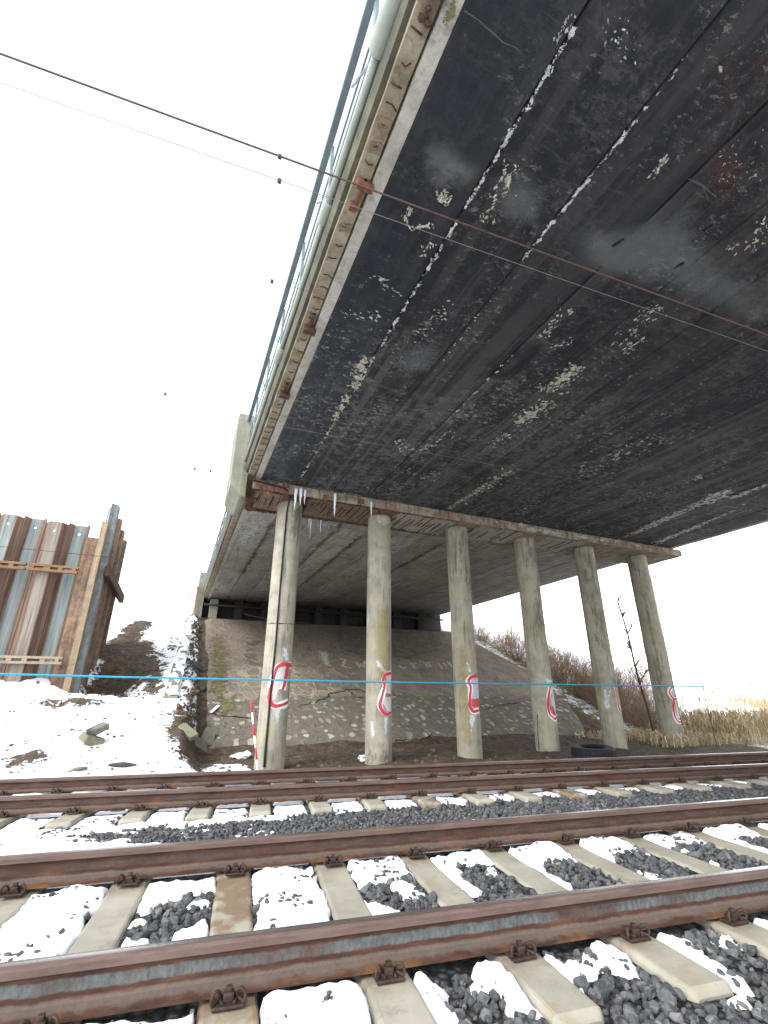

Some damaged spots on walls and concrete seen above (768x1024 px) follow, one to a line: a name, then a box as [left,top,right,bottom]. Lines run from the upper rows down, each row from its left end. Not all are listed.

water stain [464,27,578,212]
water stain [522,106,648,260]
peeling [331,356,374,421]
peeling [484,362,585,448]
water stain [618,484,767,545]
crack [300,689,365,705]